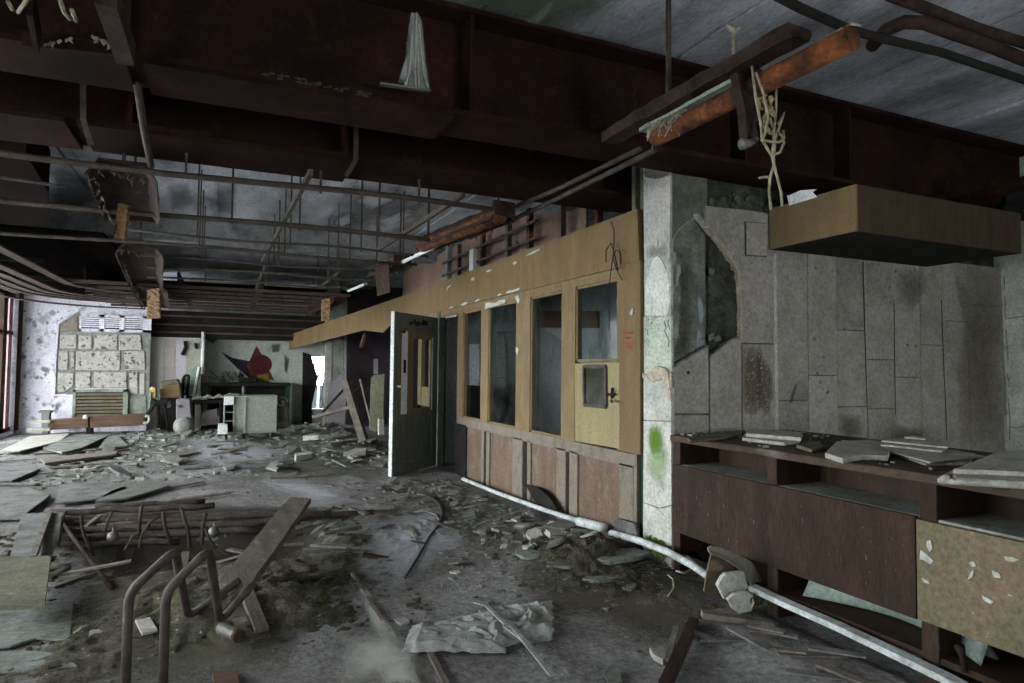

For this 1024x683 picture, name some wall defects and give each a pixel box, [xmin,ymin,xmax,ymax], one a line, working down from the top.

peeling [449,288,520,309]
flaking render [630,173,742,401]
damp [744,352,772,410]